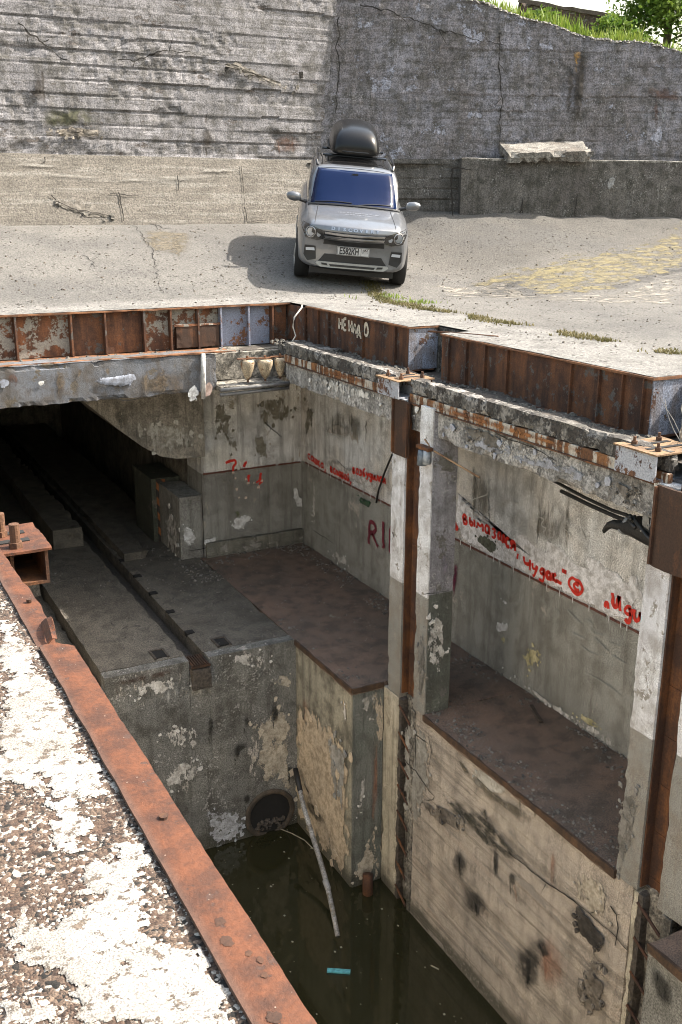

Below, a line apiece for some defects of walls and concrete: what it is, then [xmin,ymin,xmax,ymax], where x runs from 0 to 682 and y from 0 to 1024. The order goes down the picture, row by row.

crack [18,22,68,60]
crack [335,4,508,143]
peeling [442,424,583,481]
peeling [426,605,450,672]
peeling [248,673,377,885]
water stain [460,762,521,817]
peeling [207,807,246,846]
water stain [450,803,516,870]
rust [214,917,268,978]